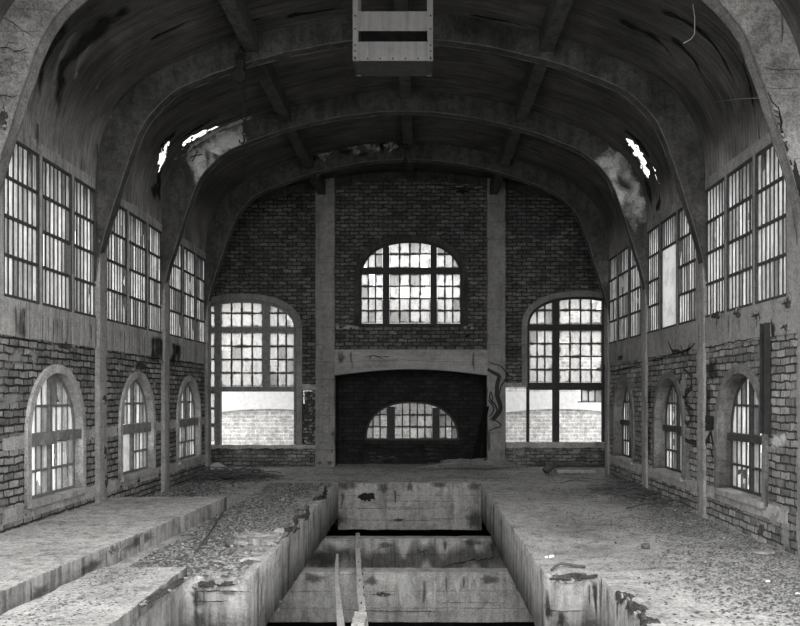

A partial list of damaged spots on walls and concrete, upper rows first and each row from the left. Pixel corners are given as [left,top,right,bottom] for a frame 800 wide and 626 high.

leakage [38,8,128,103]
crack [767,68,800,157]
spalling [160,121,212,168]
leakage [597,152,661,216]
hole [357,492,376,504]
leakage [308,540,501,594]
spalling [549,572,598,583]
spalling [620,592,661,626]